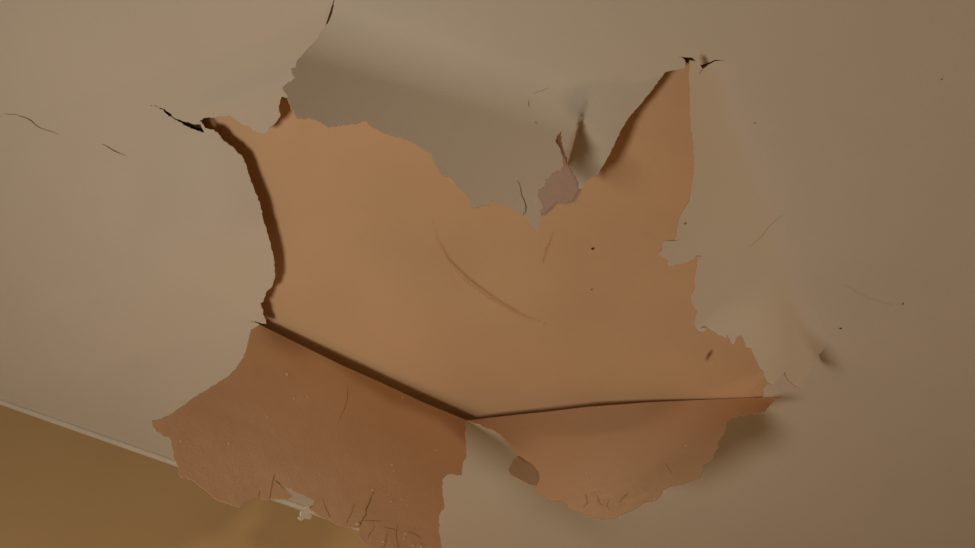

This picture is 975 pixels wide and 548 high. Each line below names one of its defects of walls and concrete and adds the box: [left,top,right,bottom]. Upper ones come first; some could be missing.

crack [161,108,204,132]
flaking render [72,0,829,548]